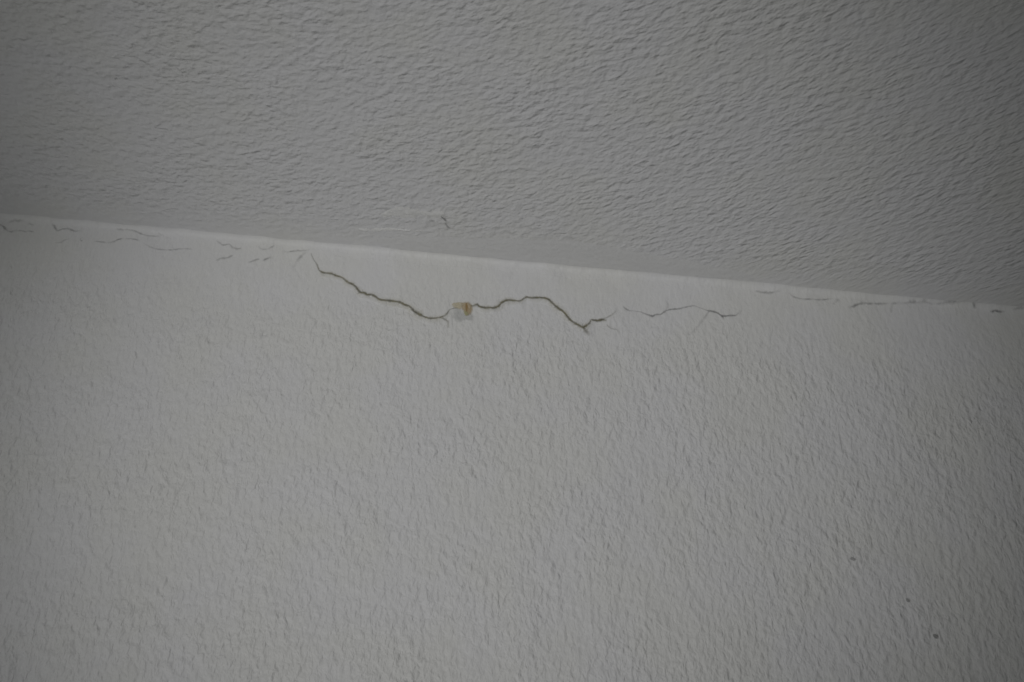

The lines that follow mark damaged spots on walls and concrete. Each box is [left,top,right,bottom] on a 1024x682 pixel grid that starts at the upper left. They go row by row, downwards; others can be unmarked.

crack [318,268,443,319]
crack [473,296,604,328]